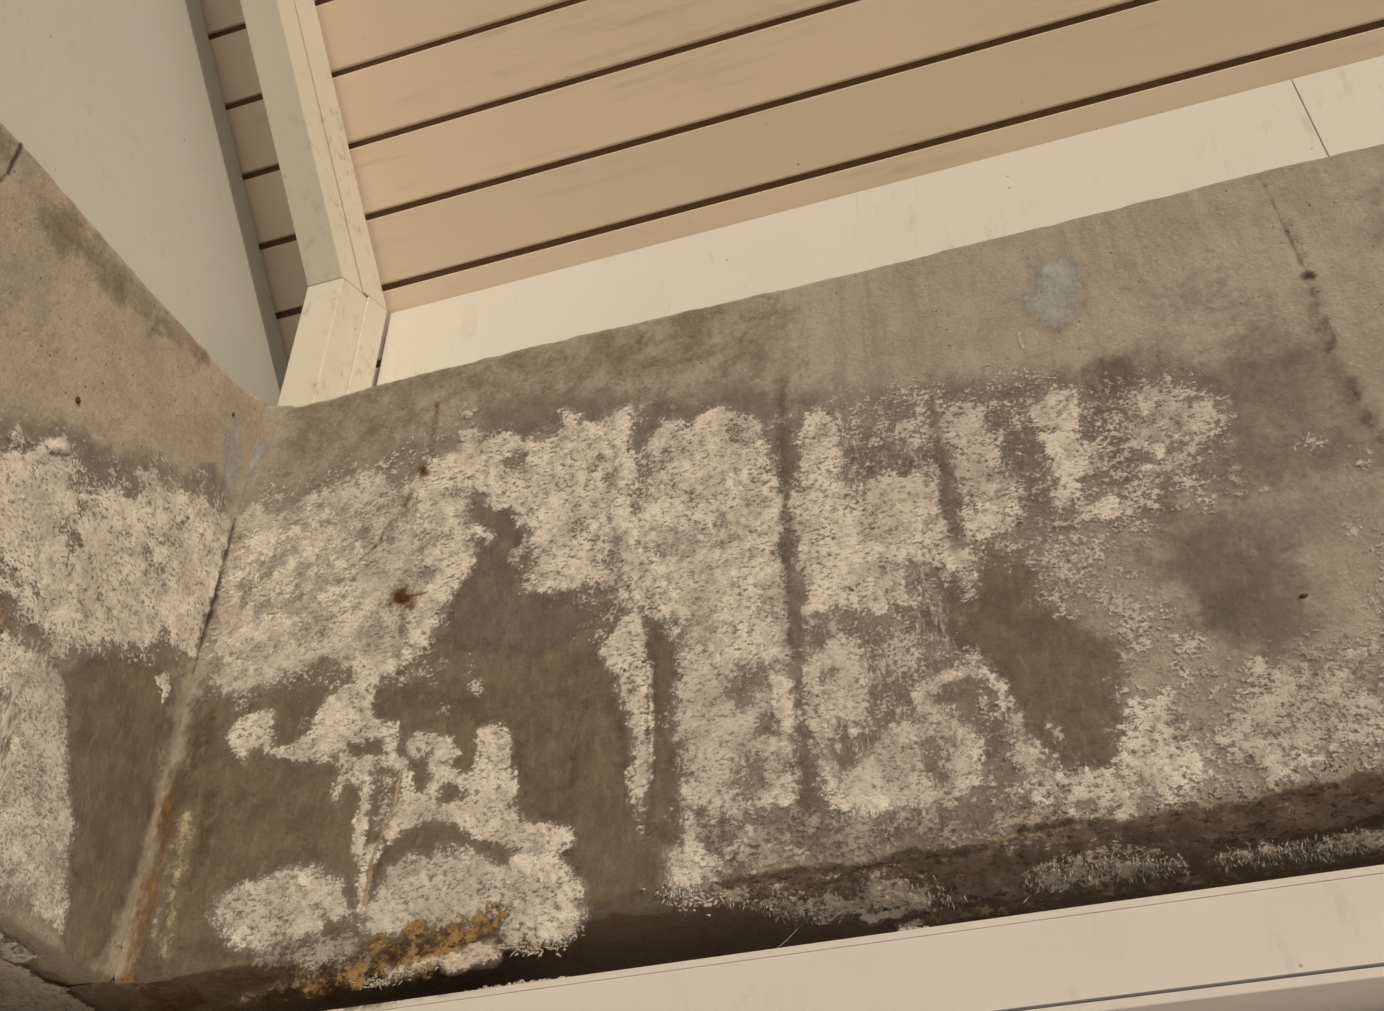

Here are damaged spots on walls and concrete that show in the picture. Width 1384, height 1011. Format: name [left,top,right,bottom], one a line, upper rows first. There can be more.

crack [0,143,22,180]
corrosion [388,584,428,623]
water stain [0,332,1384,998]
corrosion [123,768,515,1011]